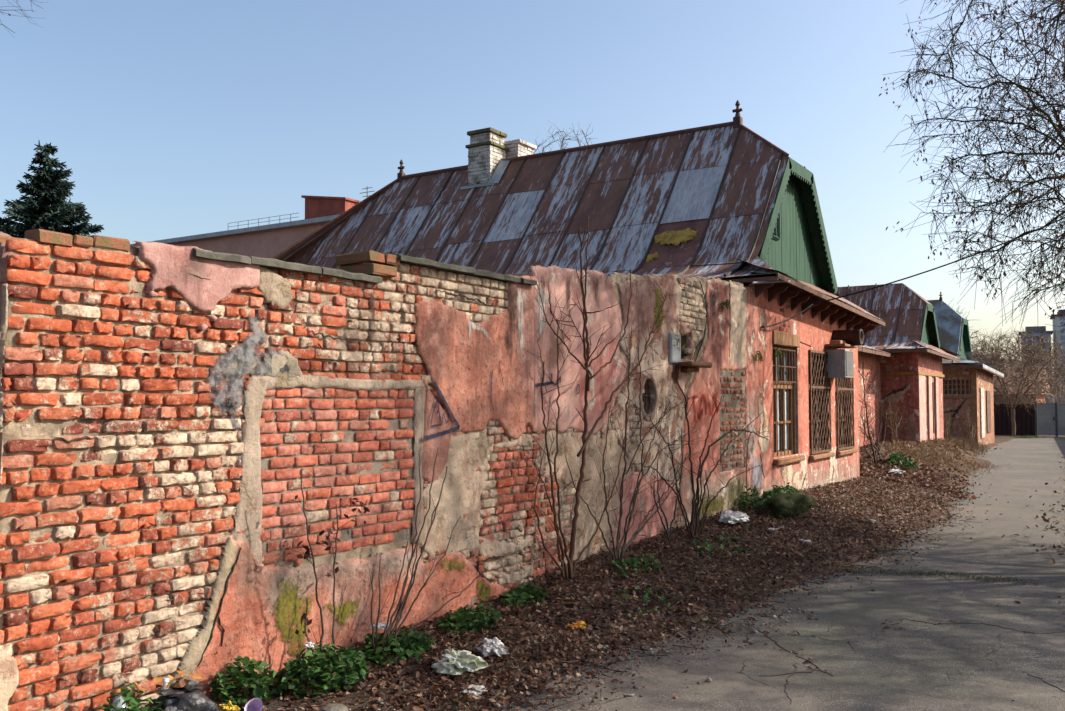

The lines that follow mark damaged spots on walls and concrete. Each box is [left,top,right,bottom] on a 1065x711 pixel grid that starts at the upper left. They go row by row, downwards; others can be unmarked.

spalling [0,239,508,711]
peeling [422,273,706,589]